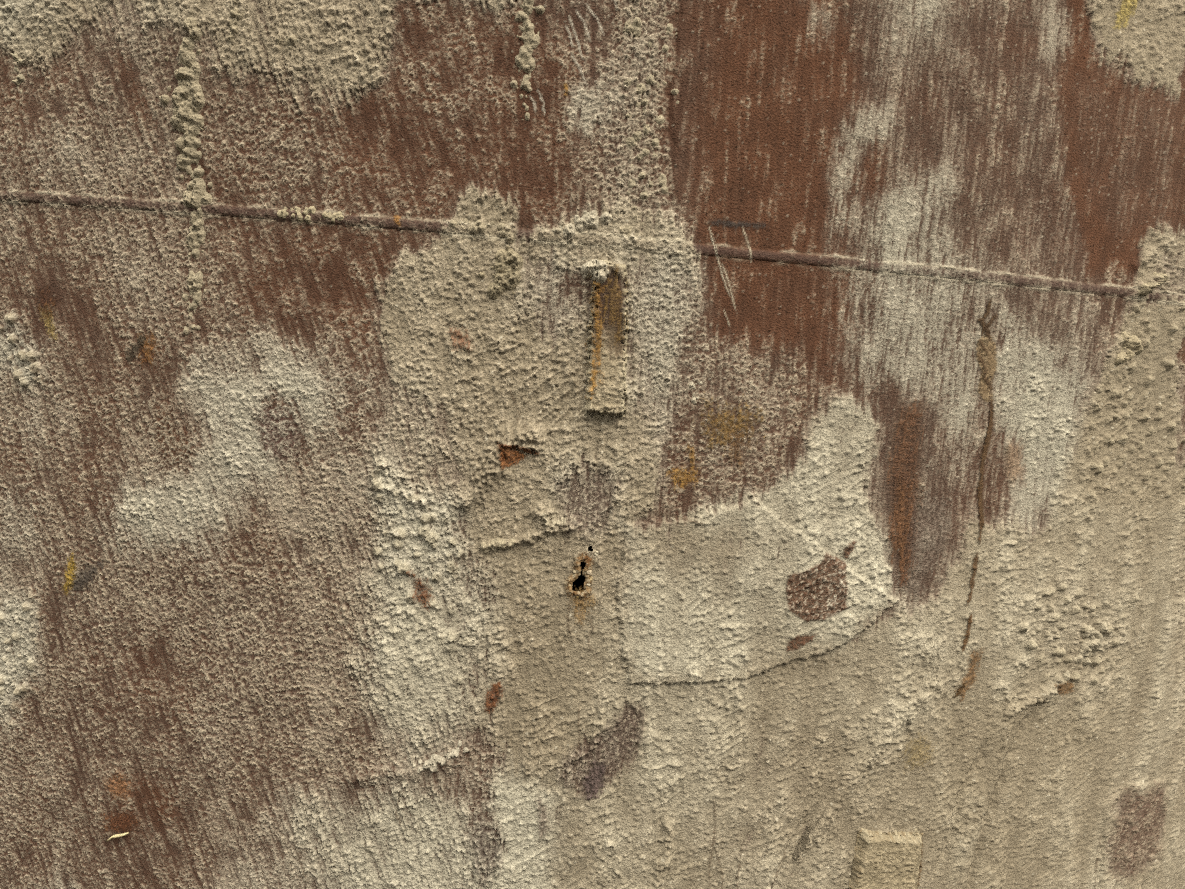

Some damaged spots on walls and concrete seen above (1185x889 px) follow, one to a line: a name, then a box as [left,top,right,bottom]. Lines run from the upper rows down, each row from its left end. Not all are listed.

rust [590,282,606,399]
rust [887,399,949,599]